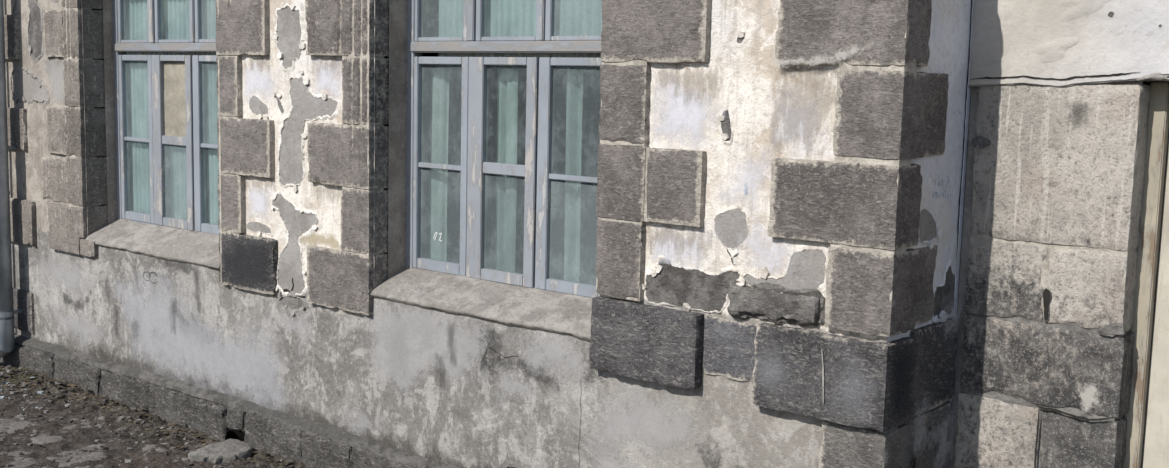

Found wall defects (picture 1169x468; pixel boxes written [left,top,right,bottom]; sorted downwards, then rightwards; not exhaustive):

peeling [246,3,341,317]
water stain [119,259,280,401]
water stain [223,243,267,286]
water stain [372,307,594,393]
peeling [713,202,751,250]
peeling [642,242,829,327]
peeling [932,259,956,323]